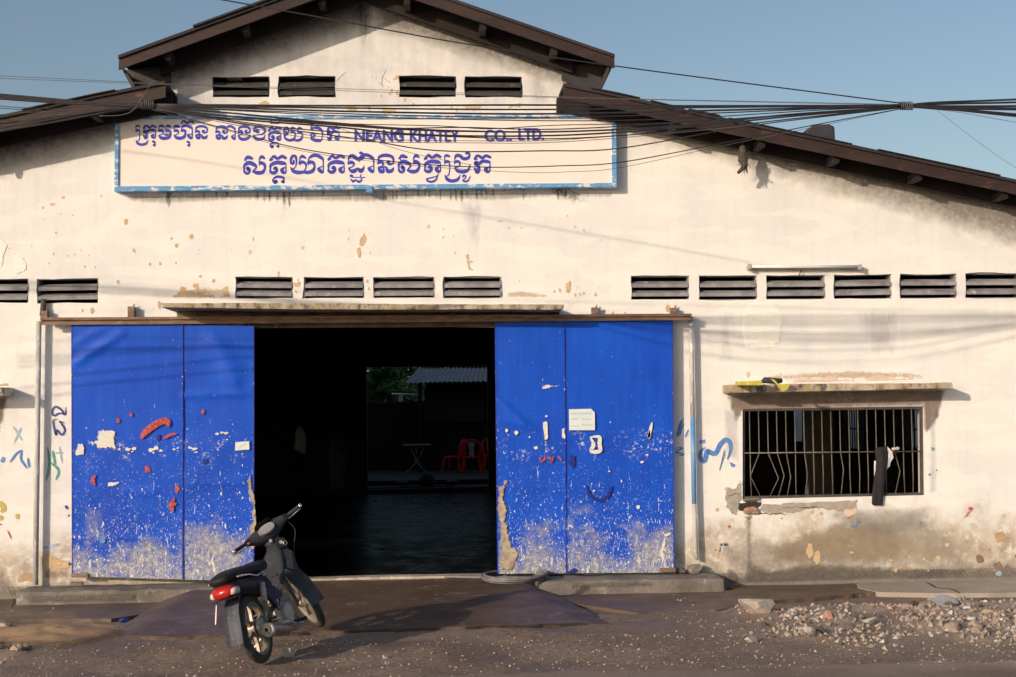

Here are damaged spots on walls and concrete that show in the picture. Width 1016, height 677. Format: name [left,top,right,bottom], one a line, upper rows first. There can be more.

peeling [173,275,230,298]
peeling [715,483,858,519]
peeling [806,543,820,564]
water stain [729,520,943,583]